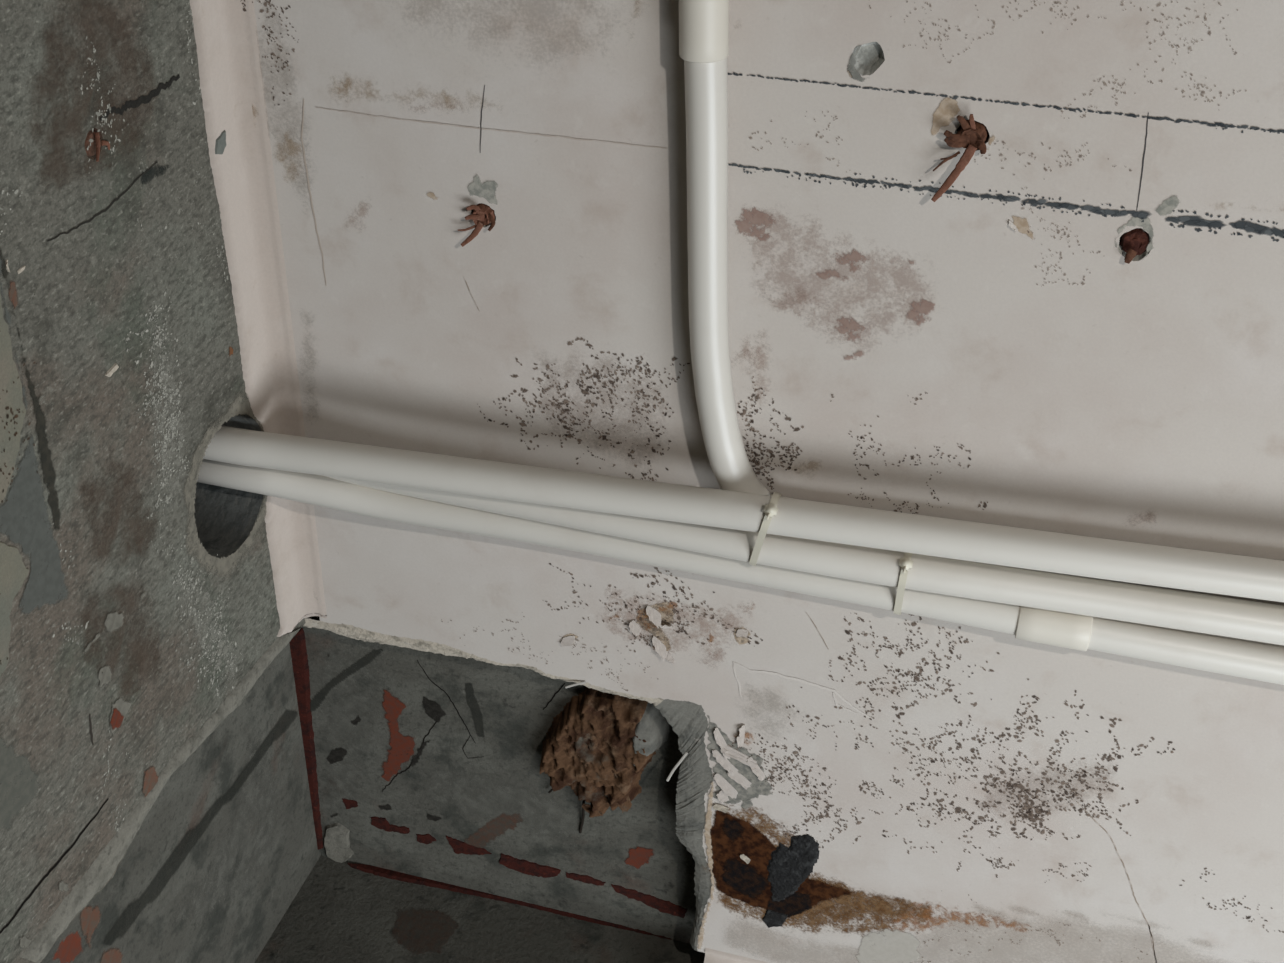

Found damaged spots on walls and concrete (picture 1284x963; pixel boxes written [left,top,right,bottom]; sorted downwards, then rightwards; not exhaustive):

crack [100,75,180,121]
crack [47,162,158,242]
leakage [736,208,775,241]
leakage [817,250,866,279]
leakage [907,299,935,325]
spalling [0,362,37,503]
leakage [479,337,690,481]
leakage [545,563,763,691]
spalling [304,616,773,951]
leakage [709,613,1175,920]
leakage [782,873,1069,963]
rust [894,903,1021,932]